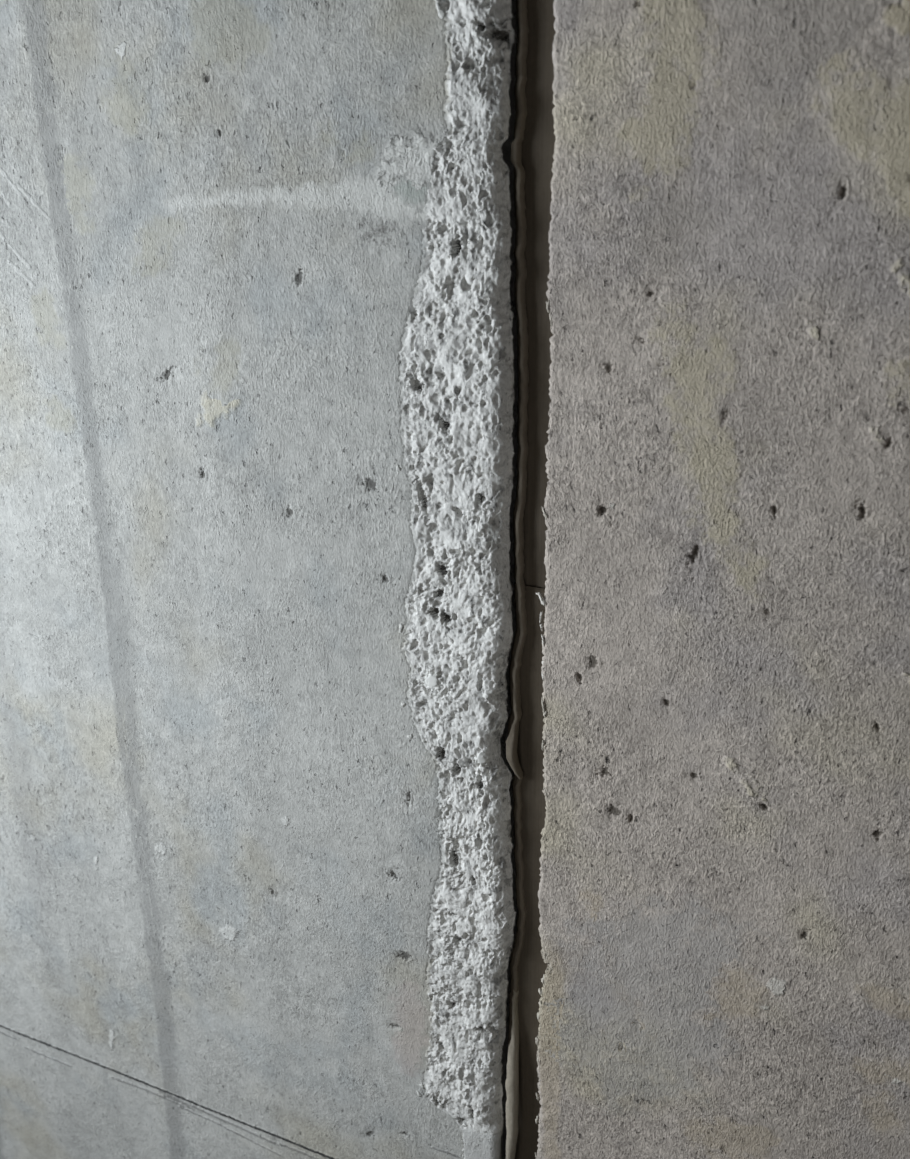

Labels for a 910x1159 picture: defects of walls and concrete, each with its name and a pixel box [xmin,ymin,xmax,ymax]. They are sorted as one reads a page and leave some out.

water stain [17,0,190,1159]
spalling [344,0,518,1136]